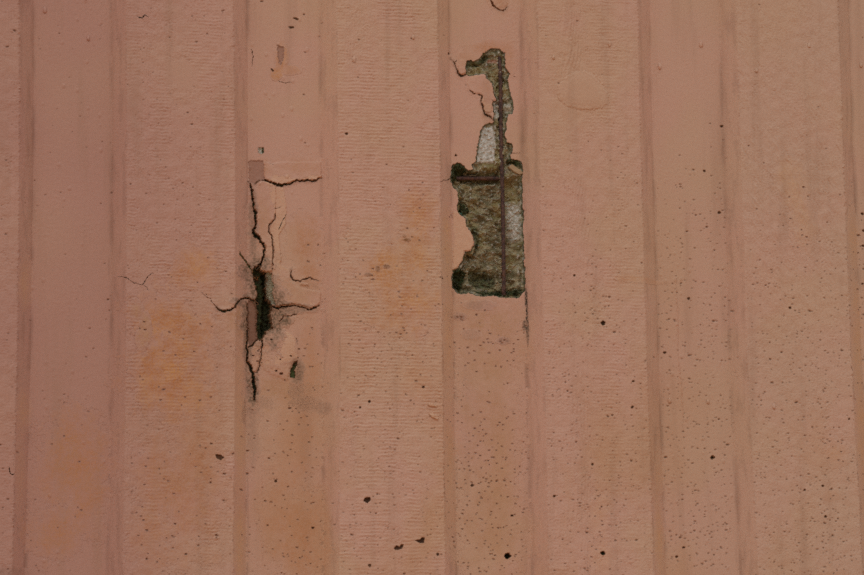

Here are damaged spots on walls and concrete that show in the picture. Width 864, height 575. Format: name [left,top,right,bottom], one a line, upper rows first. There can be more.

rust [454,31,518,104]
spalling [450,48,526,298]
crack [202,177,320,400]